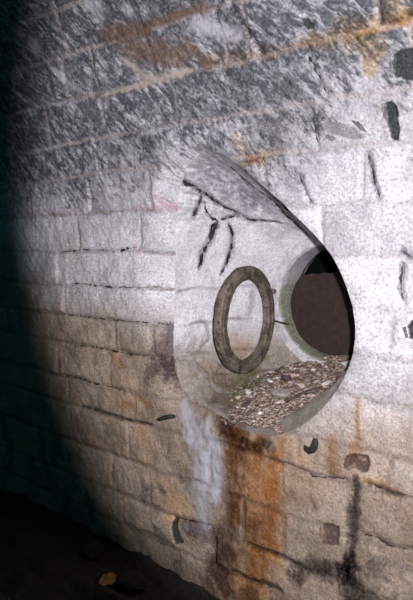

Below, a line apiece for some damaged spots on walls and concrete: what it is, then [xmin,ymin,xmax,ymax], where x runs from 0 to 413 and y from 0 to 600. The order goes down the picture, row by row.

rust [100,5,212,69]
crack [182,167,309,274]
efflorescence [181,400,222,535]
spalling [344,453,370,472]
water stain [293,477,364,600]
spalling [319,523,340,545]